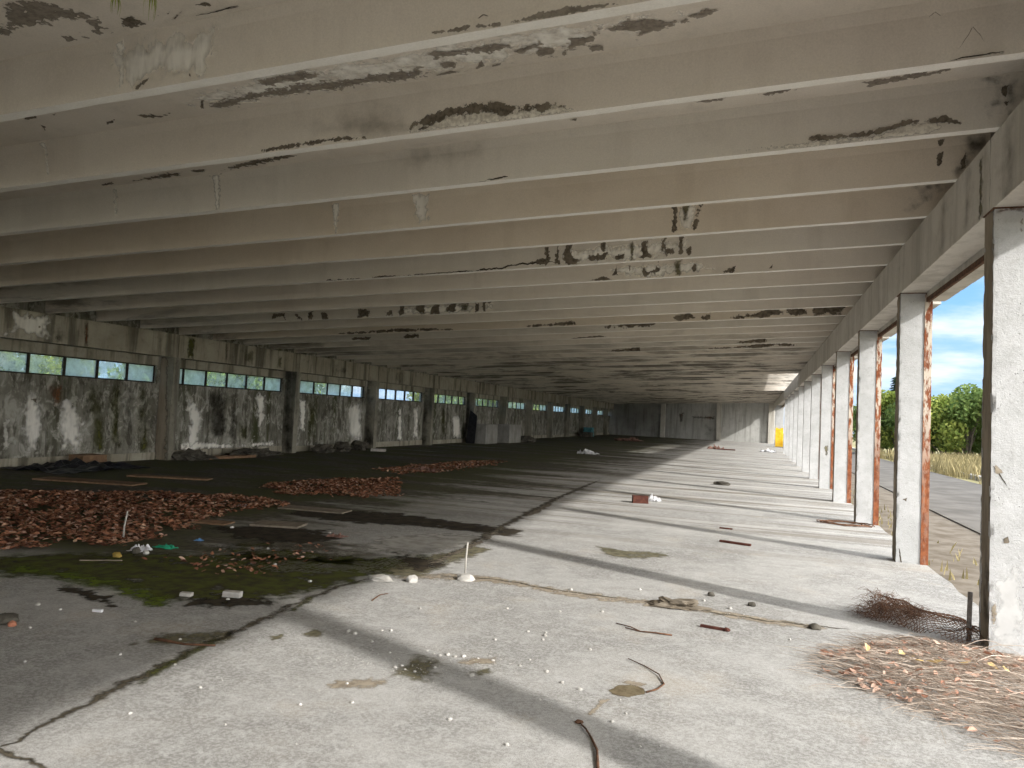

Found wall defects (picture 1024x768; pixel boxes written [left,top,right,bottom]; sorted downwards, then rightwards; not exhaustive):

leakage [117,34,211,86]
peeling [200,9,718,109]
peeling [862,27,1003,87]
spalling [410,102,577,133]
spalling [749,115,961,150]
peeling [133,169,205,181]
peeling [228,155,296,170]
leakage [25,397,41,448]
leakage [61,400,80,449]
leakage [181,373,305,450]
leakage [349,405,373,444]
crack [0,579,366,768]